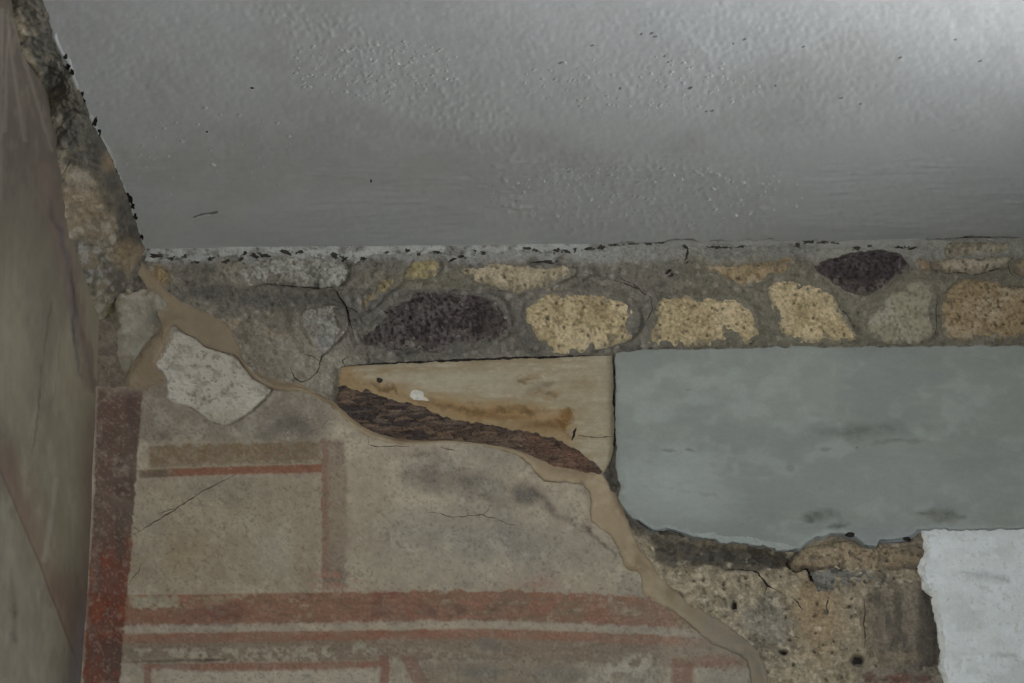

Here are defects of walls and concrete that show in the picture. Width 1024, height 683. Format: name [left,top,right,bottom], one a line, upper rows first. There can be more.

flaking render [115,288,271,426]
crack [266,284,616,467]
crack [133,474,236,534]
spalling [656,532,795,568]
crack [729,560,829,613]
spalling [810,530,949,683]